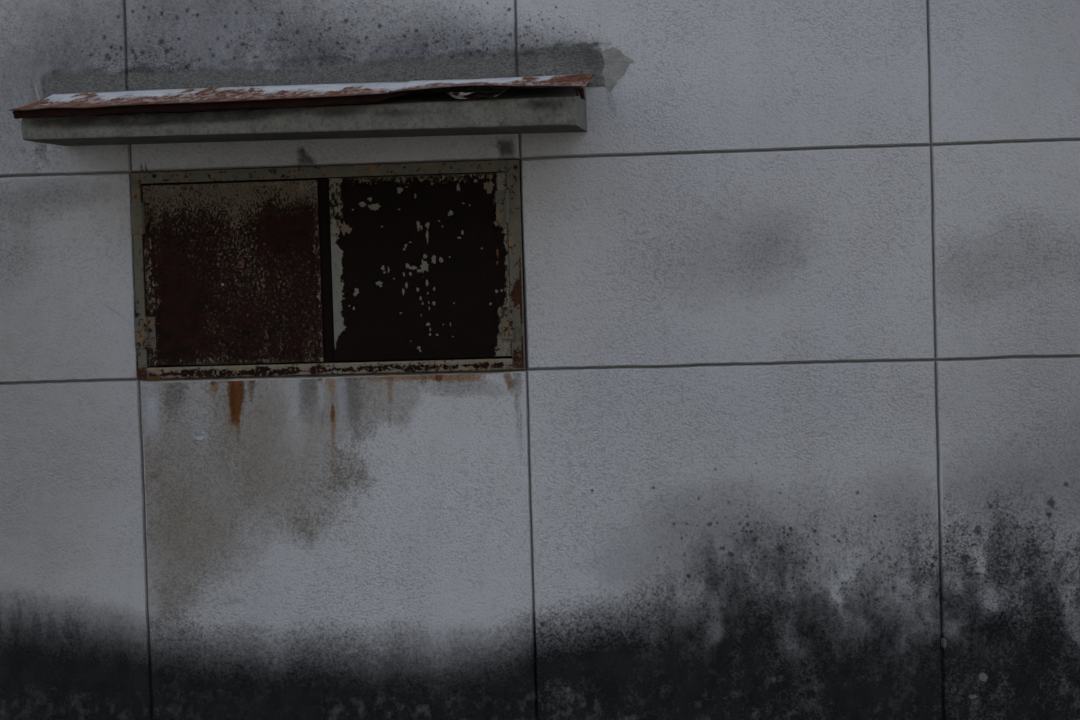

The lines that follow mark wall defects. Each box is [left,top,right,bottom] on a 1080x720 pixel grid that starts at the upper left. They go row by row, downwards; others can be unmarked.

damp [33,0,601,78]
rust [10,74,591,110]
rust [211,380,254,429]
damp [145,389,304,572]
damp [0,502,1080,720]